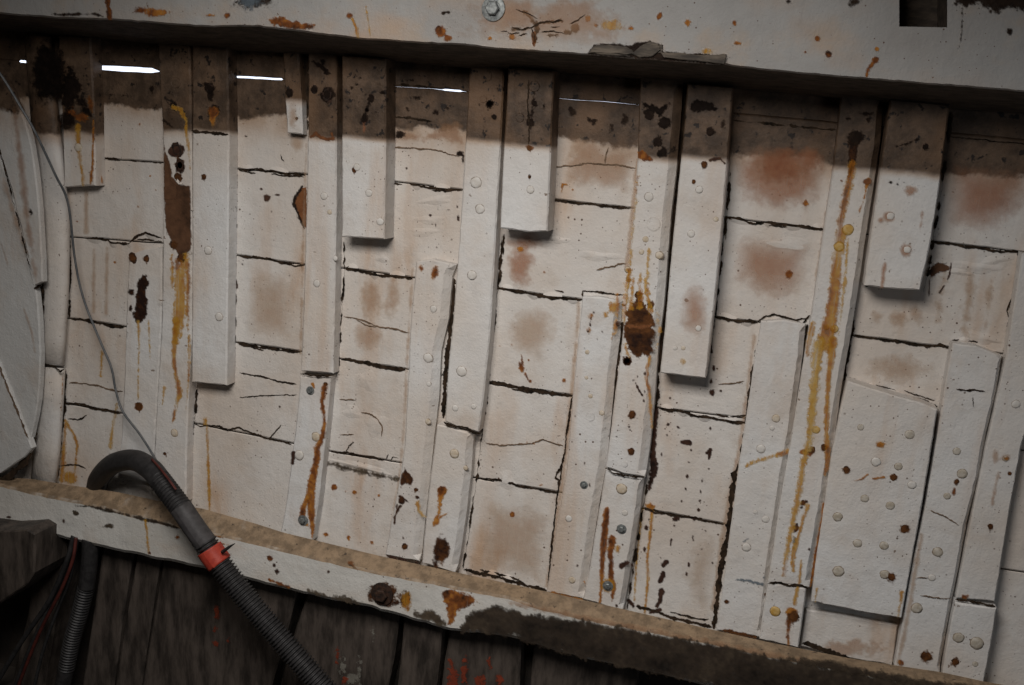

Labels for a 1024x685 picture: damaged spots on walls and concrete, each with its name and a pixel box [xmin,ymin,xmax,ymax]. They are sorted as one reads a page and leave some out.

damp [32,38,94,130]
damp [351,77,385,129]
damp [748,152,815,206]
rust [127,253,150,412]
rust [299,382,328,537]
crack [235,242,412,398]
crack [441,279,573,591]
crack [494,235,626,332]
rust [589,248,661,427]
crack [605,85,755,629]
rust [746,130,871,644]
rust [599,507,620,603]